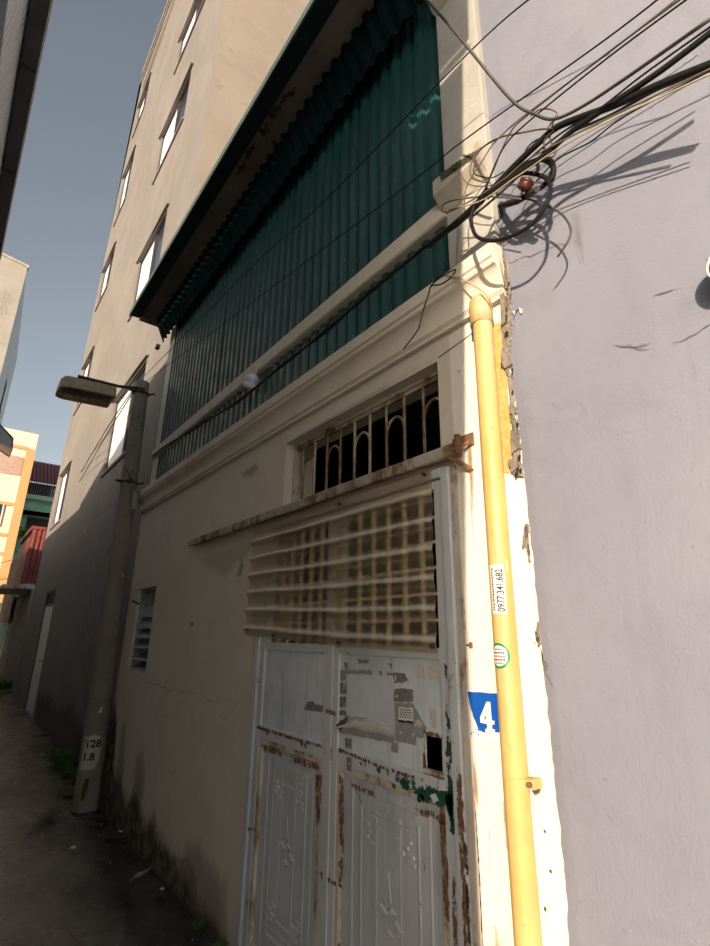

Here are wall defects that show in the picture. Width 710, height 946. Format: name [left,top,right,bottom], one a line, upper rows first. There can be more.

spalling [499,251,524,478]
leakage [99,707,221,943]
corrosion [261,745,322,826]
corrosion [317,774,376,889]
corrosion [257,726,444,781]
peeling [376,711,455,835]
corrosion [415,774,471,946]